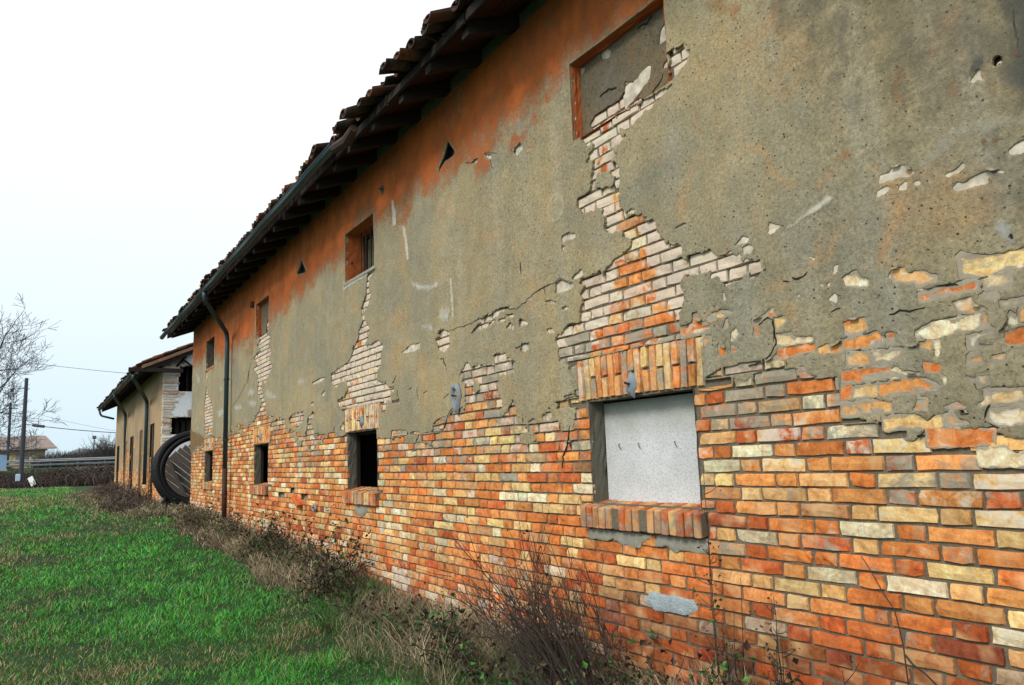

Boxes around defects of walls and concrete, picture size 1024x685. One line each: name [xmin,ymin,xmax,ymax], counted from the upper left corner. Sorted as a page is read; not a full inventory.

peeling [193,0,646,463]
crack [453,278,569,330]
spalling [547,26,766,372]
peeling [751,247,1024,469]
spalling [876,164,920,197]
spalling [946,162,1004,191]